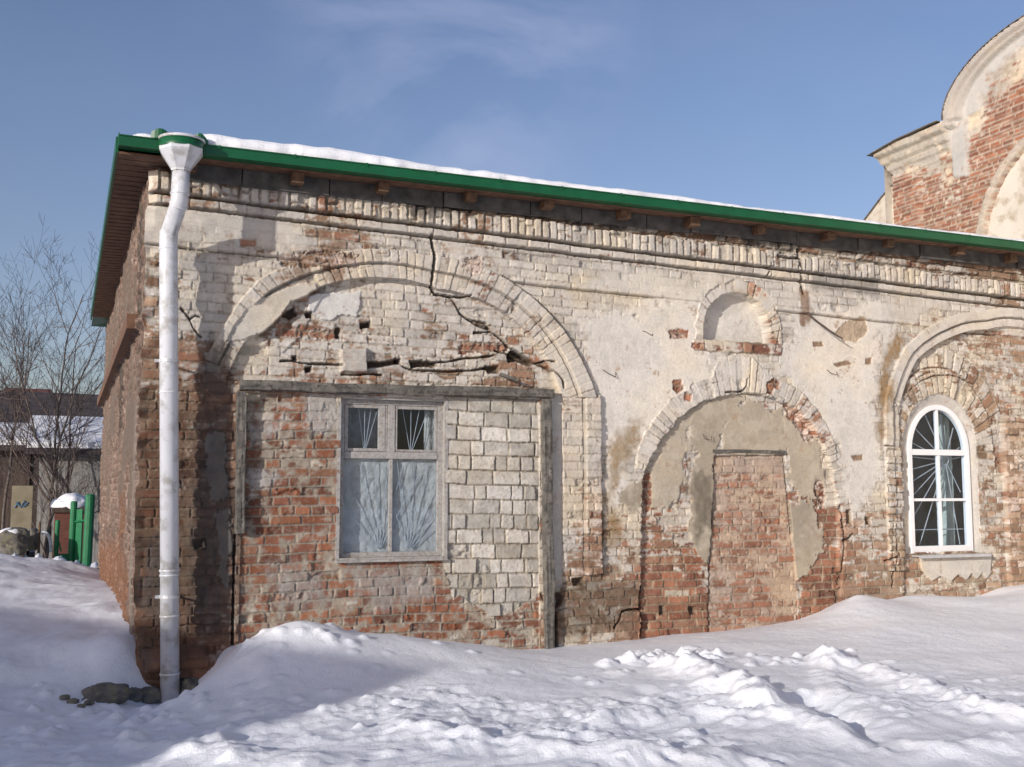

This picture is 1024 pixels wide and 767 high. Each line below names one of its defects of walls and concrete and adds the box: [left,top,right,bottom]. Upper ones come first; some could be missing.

peeling [275,290,362,341]
crack [279,232,566,390]
spalling [409,359,440,368]
flaking render [458,340,530,374]
peeling [668,328,702,349]
peeling [835,315,869,343]
spalling [783,402,822,442]
damp [612,426,636,482]
spalling [641,471,653,514]
spalling [813,479,827,509]
peeling [193,507,234,592]
spalling [571,576,586,586]